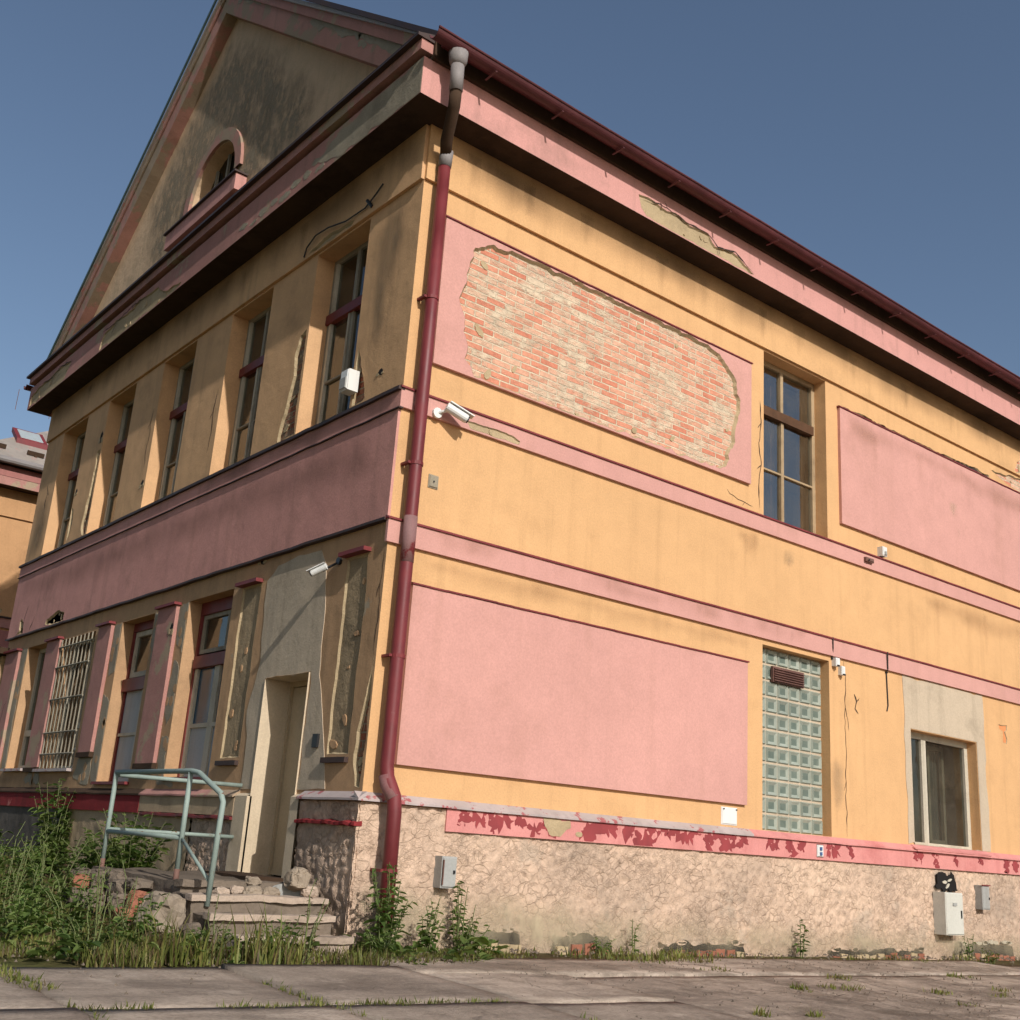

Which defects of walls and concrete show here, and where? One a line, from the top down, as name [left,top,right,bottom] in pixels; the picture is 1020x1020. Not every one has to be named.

water stain [153,57,304,259]
flaking render [639,194,753,274]
flaking render [99,282,181,350]
flaking render [277,329,307,443]
flaking render [459,245,740,468]
flaking render [838,405,1020,492]
flaking render [220,584,262,759]
flaking render [327,554,374,788]
peeling [457,810,749,852]
peeling [766,838,806,857]
peeling [826,844,855,859]
peeling [1003,860,1019,873]